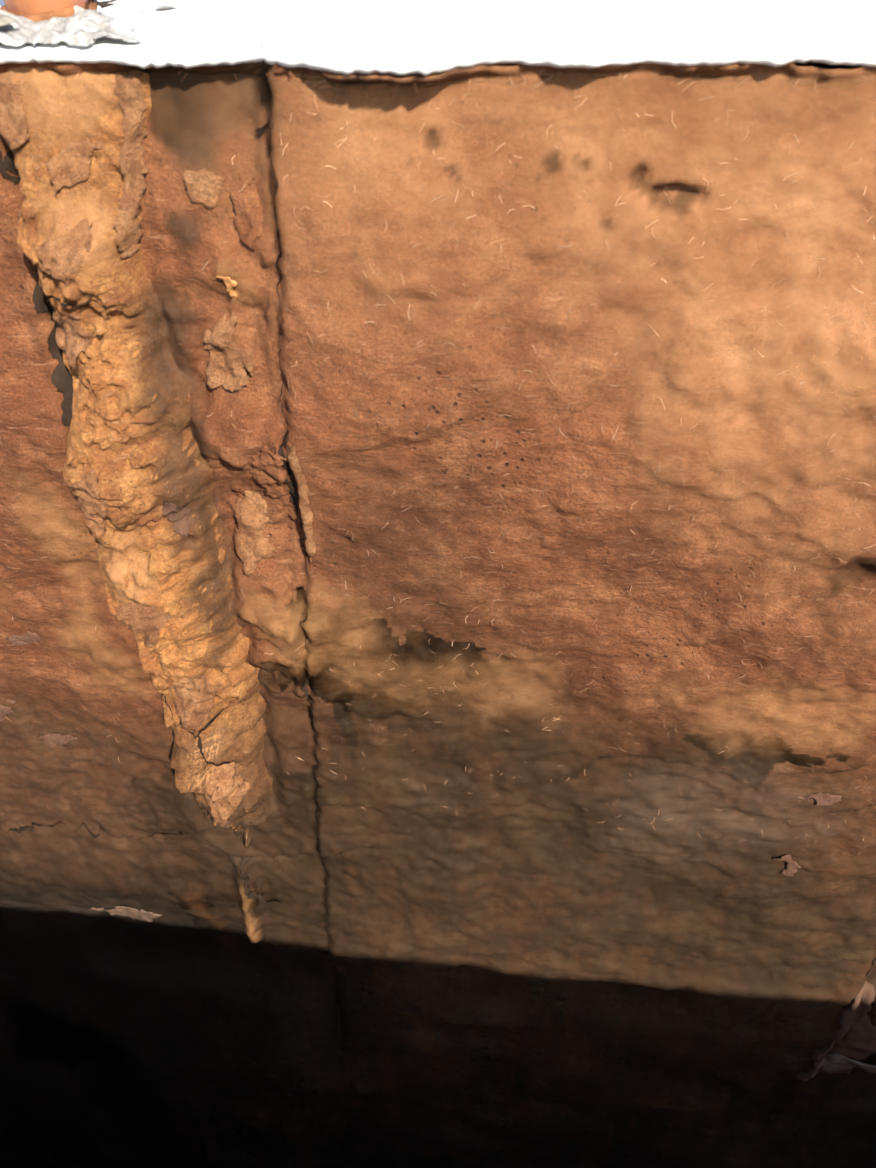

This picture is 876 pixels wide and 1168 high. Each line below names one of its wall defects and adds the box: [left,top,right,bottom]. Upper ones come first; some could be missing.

crack [0,149,20,184]
crack [32,266,112,426]
crack [221,24,345,1064]
crack [162,694,235,766]
crack [1,822,188,841]
peeling [773,855,801,877]
peeling [808,792,842,806]
peeling [797,981,876,1082]